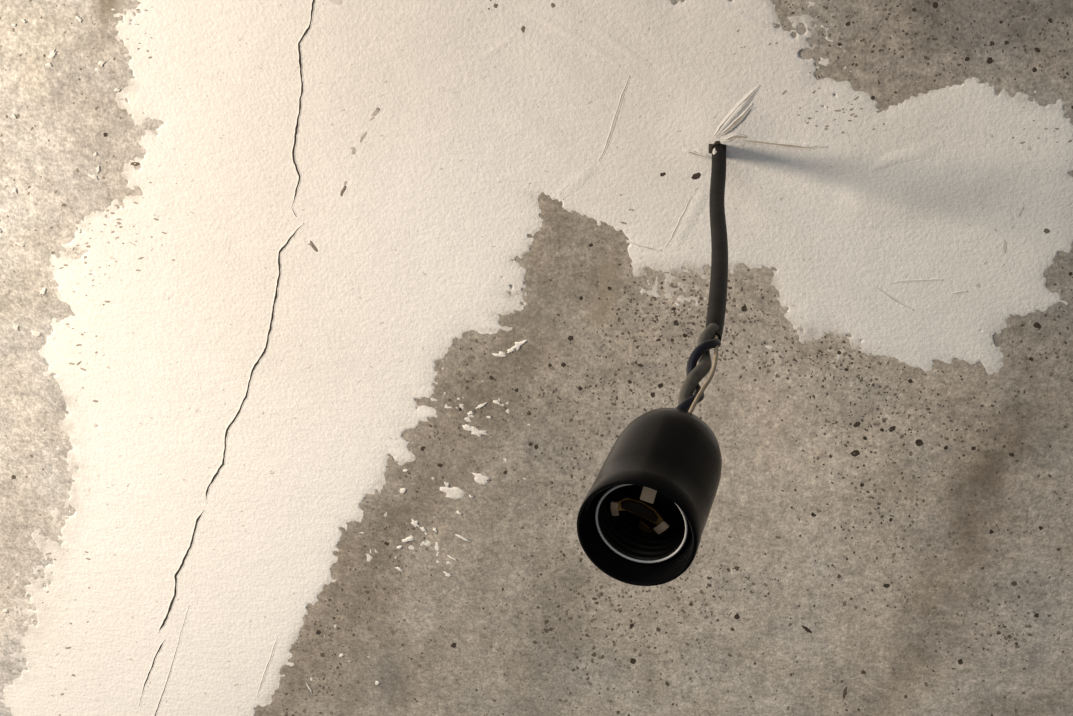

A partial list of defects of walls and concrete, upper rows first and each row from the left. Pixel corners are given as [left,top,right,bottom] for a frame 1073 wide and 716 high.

crack [138,0,316,716]
flaking render [492,339,528,357]
flaking render [462,400,502,437]
flaking render [471,472,490,485]
flaking render [440,482,475,515]
flaking render [396,519,438,549]